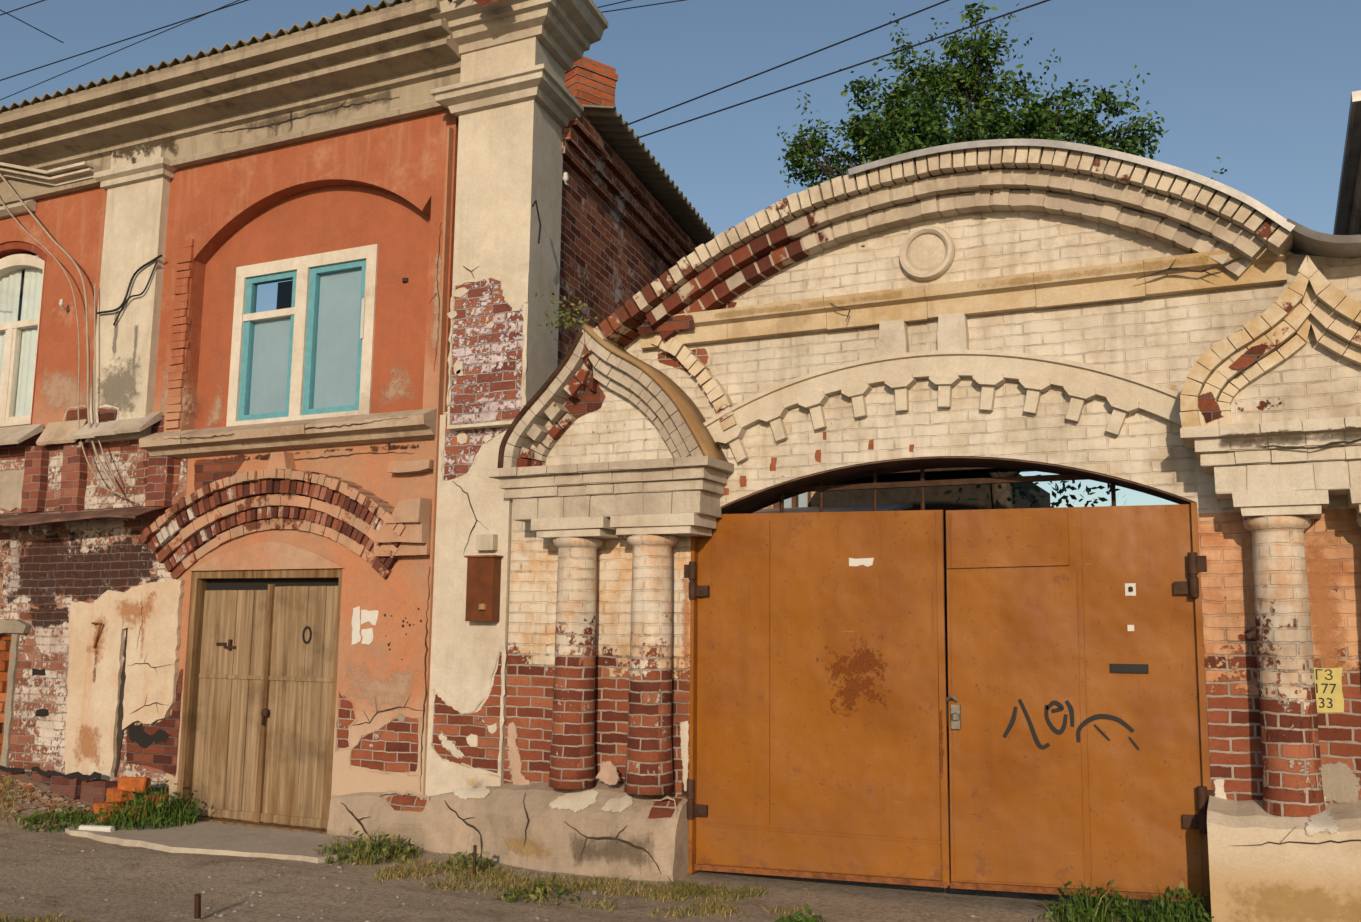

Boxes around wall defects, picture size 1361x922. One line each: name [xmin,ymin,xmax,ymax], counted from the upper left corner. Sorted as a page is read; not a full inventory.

flaking render [440,270,529,486]
crack [453,481,486,554]
flaking render [64,579,185,823]
crack [114,599,172,777]
crack [341,803,371,837]
crack [356,566,482,857]
flaking render [335,635,530,812]
crack [564,821,661,874]
flaking render [548,683,689,818]
rust [817,636,890,715]
crack [1240,832,1361,846]
flaking render [1261,717,1361,837]